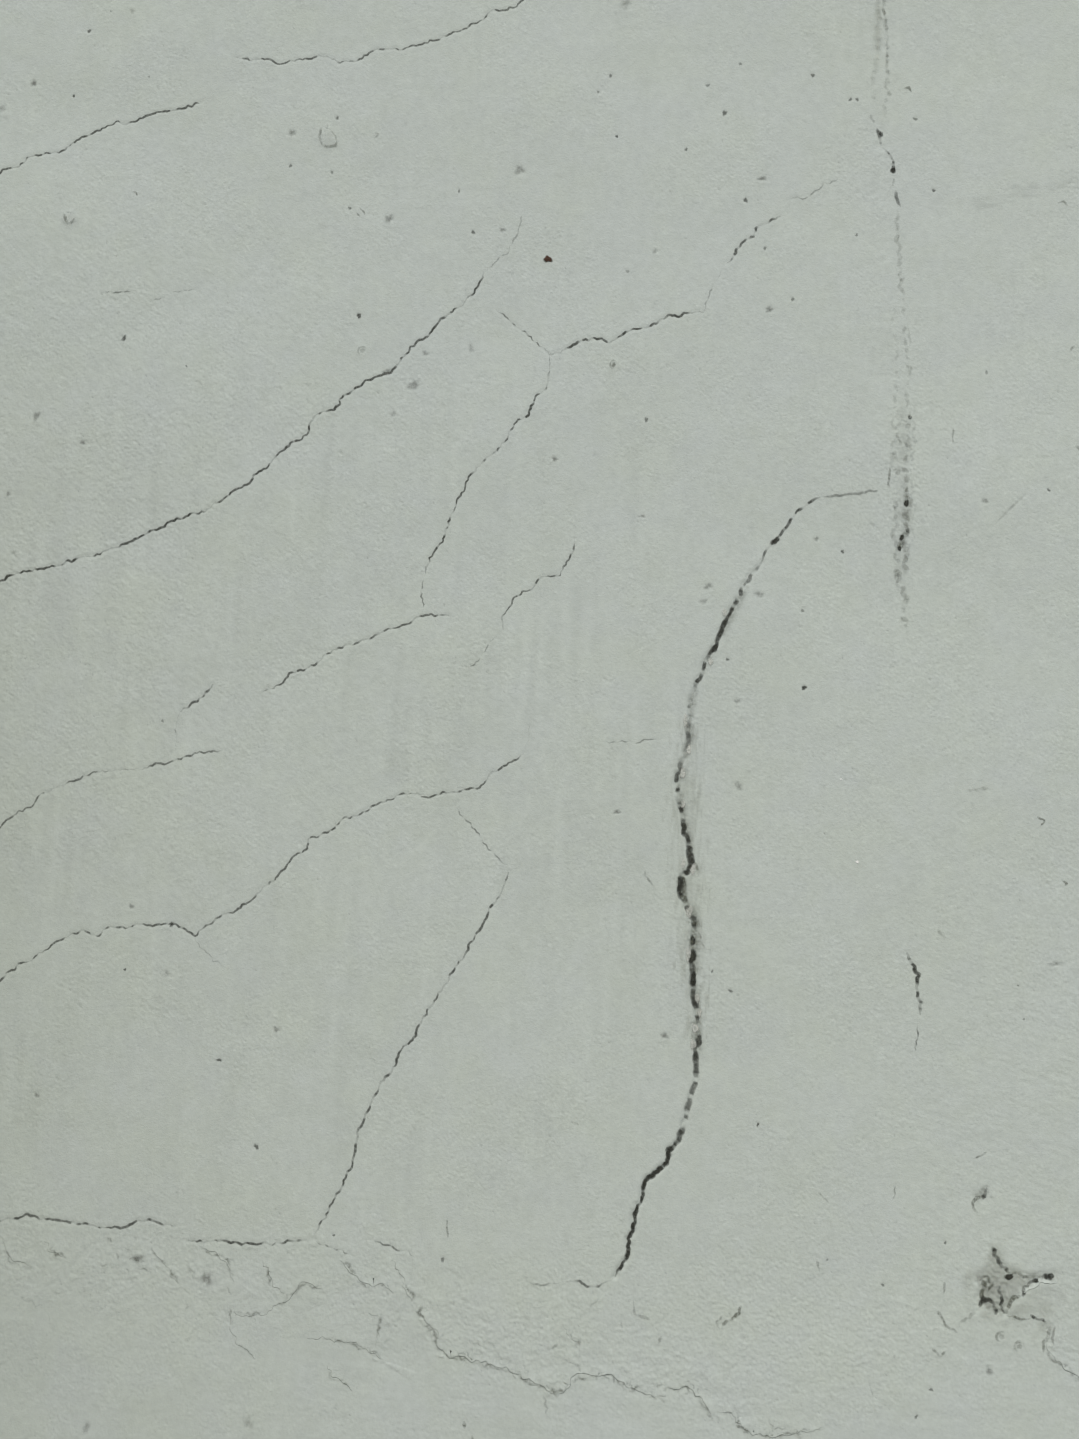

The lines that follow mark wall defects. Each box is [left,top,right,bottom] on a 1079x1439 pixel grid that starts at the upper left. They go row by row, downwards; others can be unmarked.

crack [0,102,197,174]
crack [569,312,688,348]
crack [0,280,481,581]
crack [619,500,812,1270]
crack [911,963,920,997]
crack [320,904,493,1223]
crack [198,1238,288,1246]
spalling [980,1248,1057,1321]